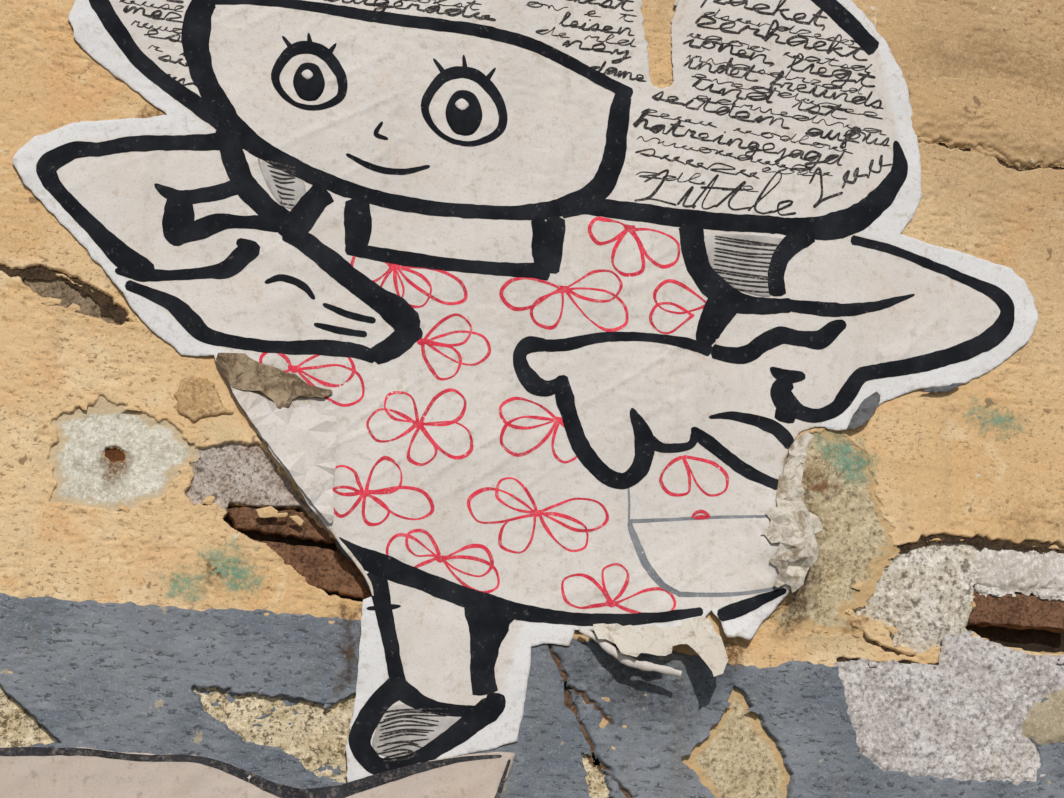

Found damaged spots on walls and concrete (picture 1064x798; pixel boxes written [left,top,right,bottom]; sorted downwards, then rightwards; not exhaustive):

crack [0,265,129,324]
peeling [47,376,371,602]
spalling [767,429,1064,786]
spalling [0,687,58,748]
spalling [193,687,356,786]
crack [548,644,631,798]
spalling [681,688,790,798]